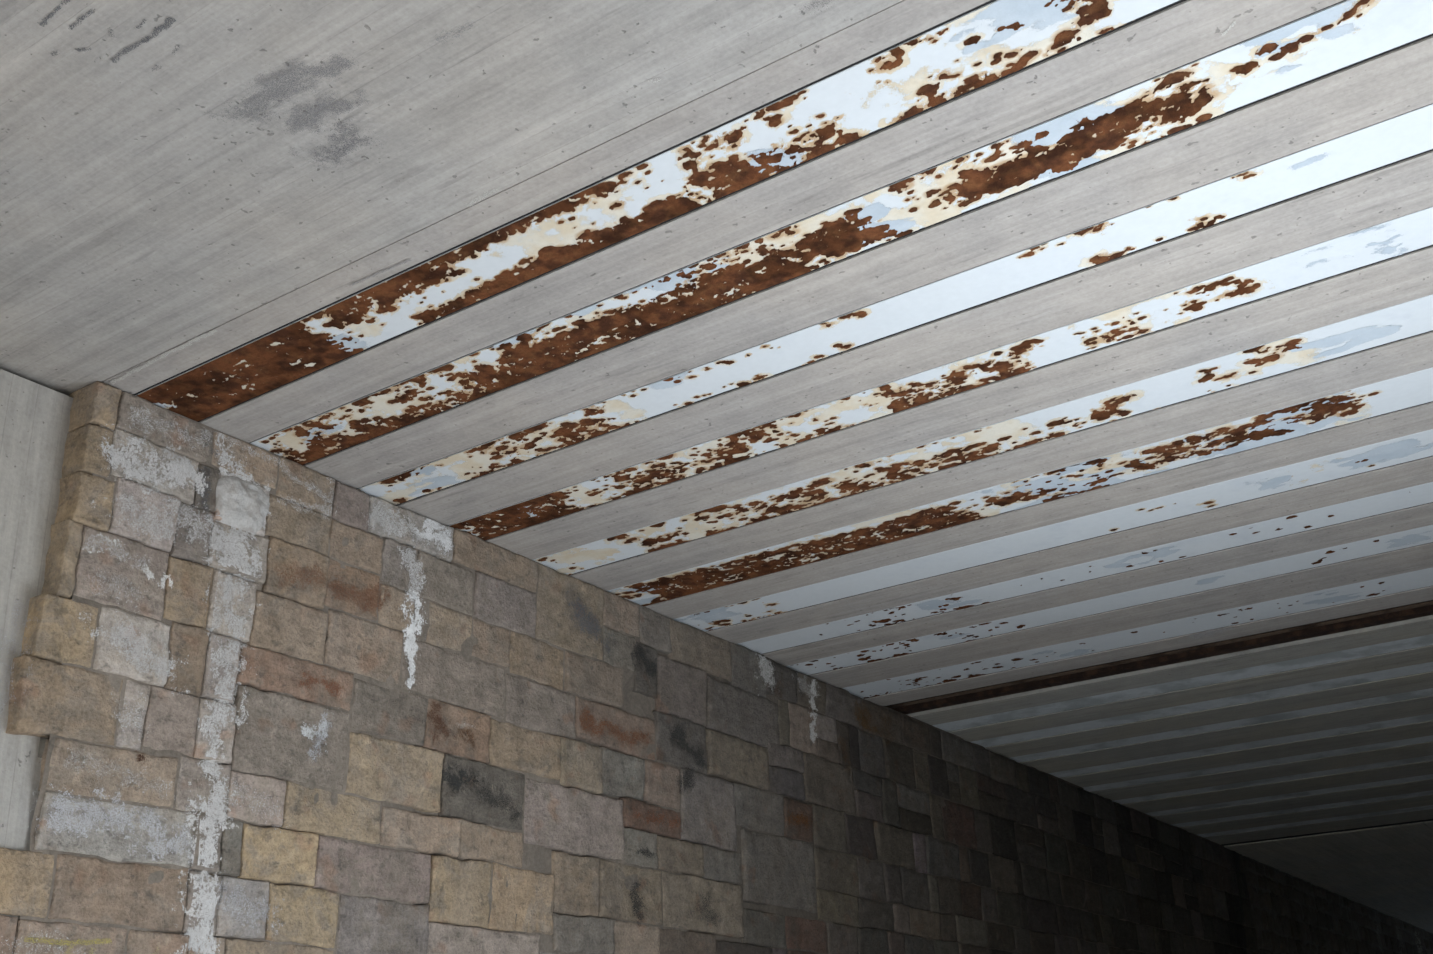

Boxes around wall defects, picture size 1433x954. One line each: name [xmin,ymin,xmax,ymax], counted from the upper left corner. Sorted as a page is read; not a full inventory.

damp [28,405,337,954]
efflorescence [364,500,454,689]
corrosion [137,90,867,421]
peeling [358,344,781,505]
corrosion [261,208,913,465]
peeling [674,598,788,632]
corrosion [450,339,1044,540]
peeling [451,336,1050,538]
peeling [136,0,1402,461]
corrosion [607,392,1379,606]
corrosion [888,63,1214,213]
peeling [1245,438,1433,492]